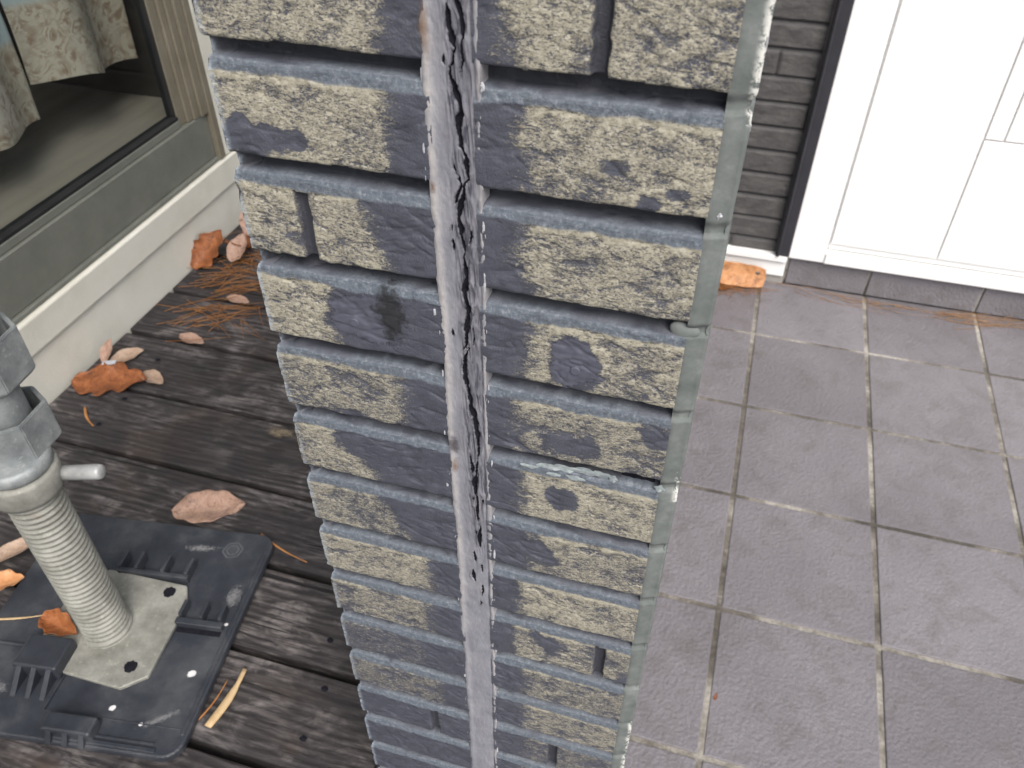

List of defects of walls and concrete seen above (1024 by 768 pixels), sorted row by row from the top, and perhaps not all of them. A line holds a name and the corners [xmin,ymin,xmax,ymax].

water stain [370,279,405,340]
crack [442,0,484,605]